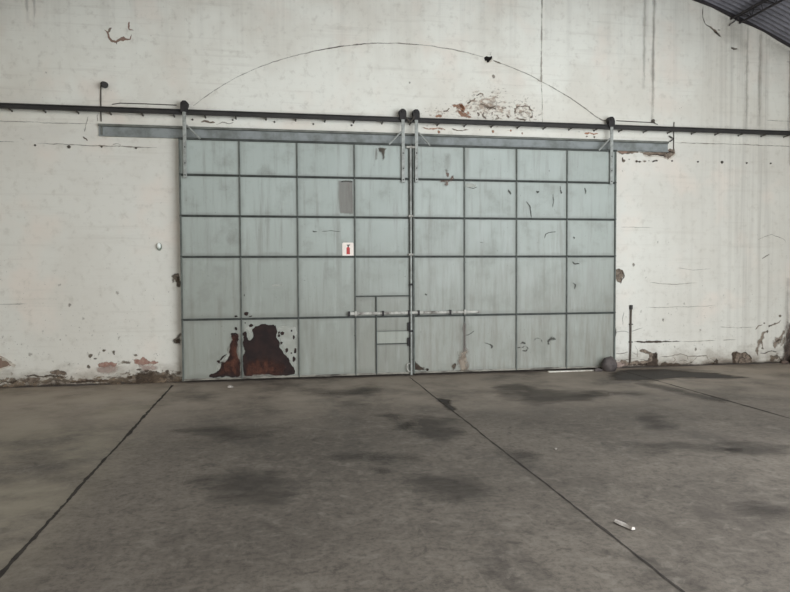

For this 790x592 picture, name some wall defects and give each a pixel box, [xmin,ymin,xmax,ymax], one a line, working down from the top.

peeling [436,93,533,121]
flaking render [617,149,676,163]
corrosion [209,312,296,378]
flaking render [732,315,785,364]
flaking render [0,350,182,388]